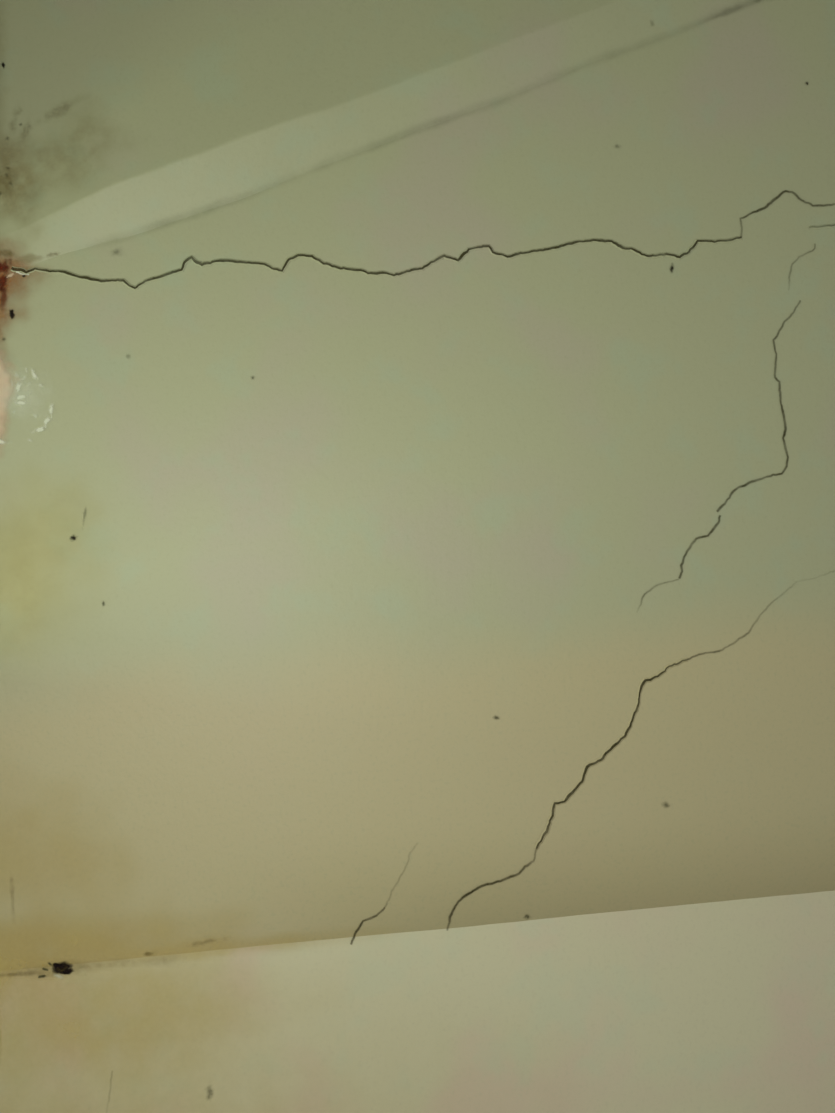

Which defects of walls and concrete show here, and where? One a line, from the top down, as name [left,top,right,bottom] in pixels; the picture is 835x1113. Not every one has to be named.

corrosion [0,252,25,319]
crack [11,190,835,291]
crack [679,326,789,579]
crack [449,657,688,921]